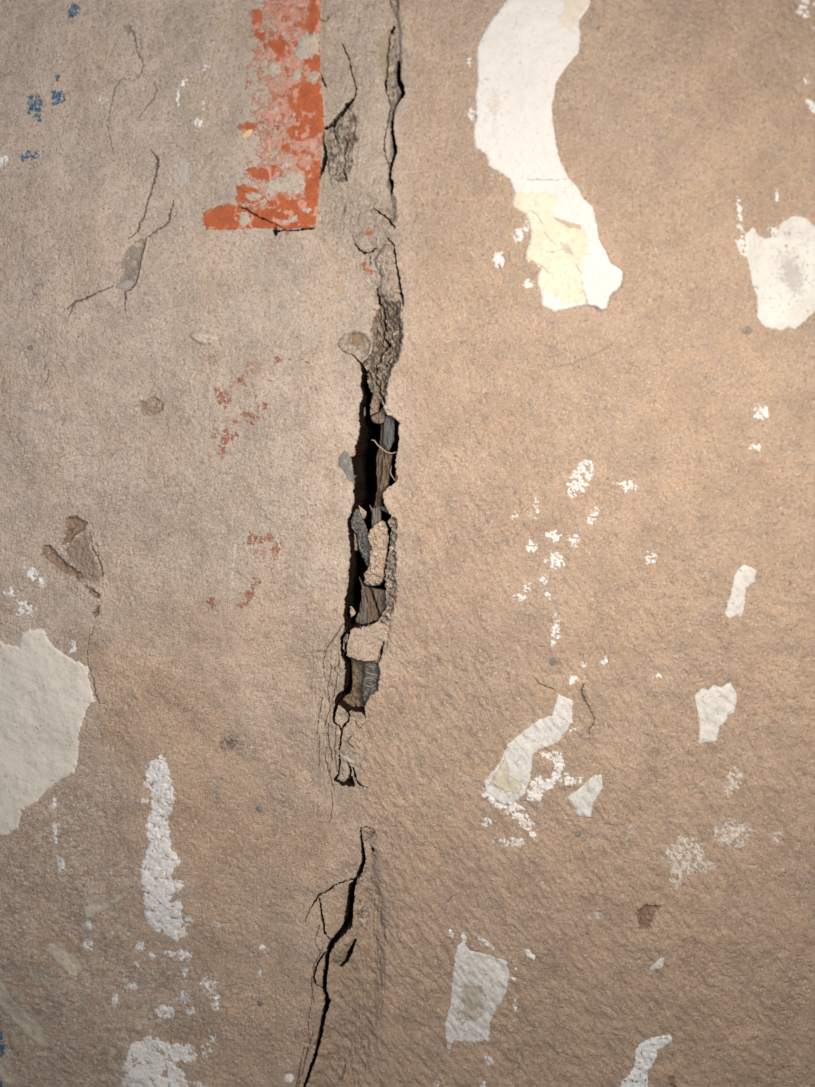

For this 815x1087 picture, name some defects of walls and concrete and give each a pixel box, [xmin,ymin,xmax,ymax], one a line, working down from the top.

crack [320,44,358,216]
crack [355,61,405,308]
peeling [492,252,506,268]
peeling [513,220,530,243]
peeling [734,196,749,257]
peeling [3,586,37,619]
peeling [26,567,45,588]
flaking render [43,515,101,617]
crack [316,336,400,821]
peeling [481,751,587,847]
crack [296,826,375,1087]
peeling [448,929,494,950]